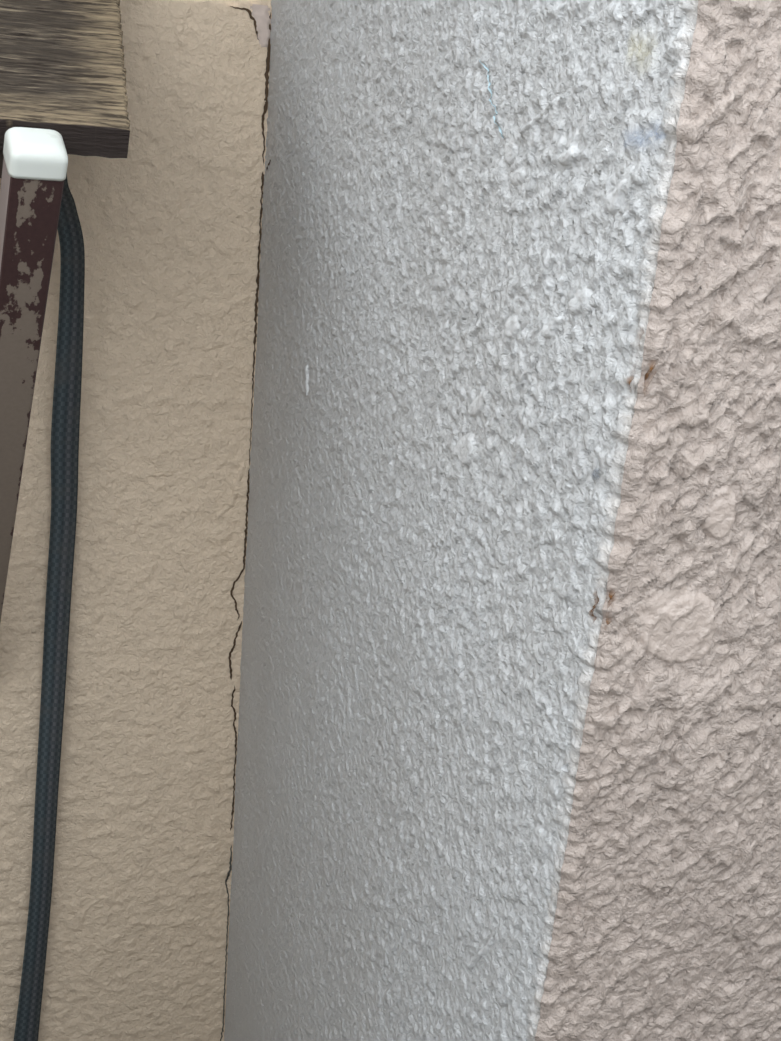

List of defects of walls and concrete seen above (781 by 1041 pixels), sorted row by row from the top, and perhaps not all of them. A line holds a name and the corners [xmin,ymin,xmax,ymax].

crack [220,6,271,1041]